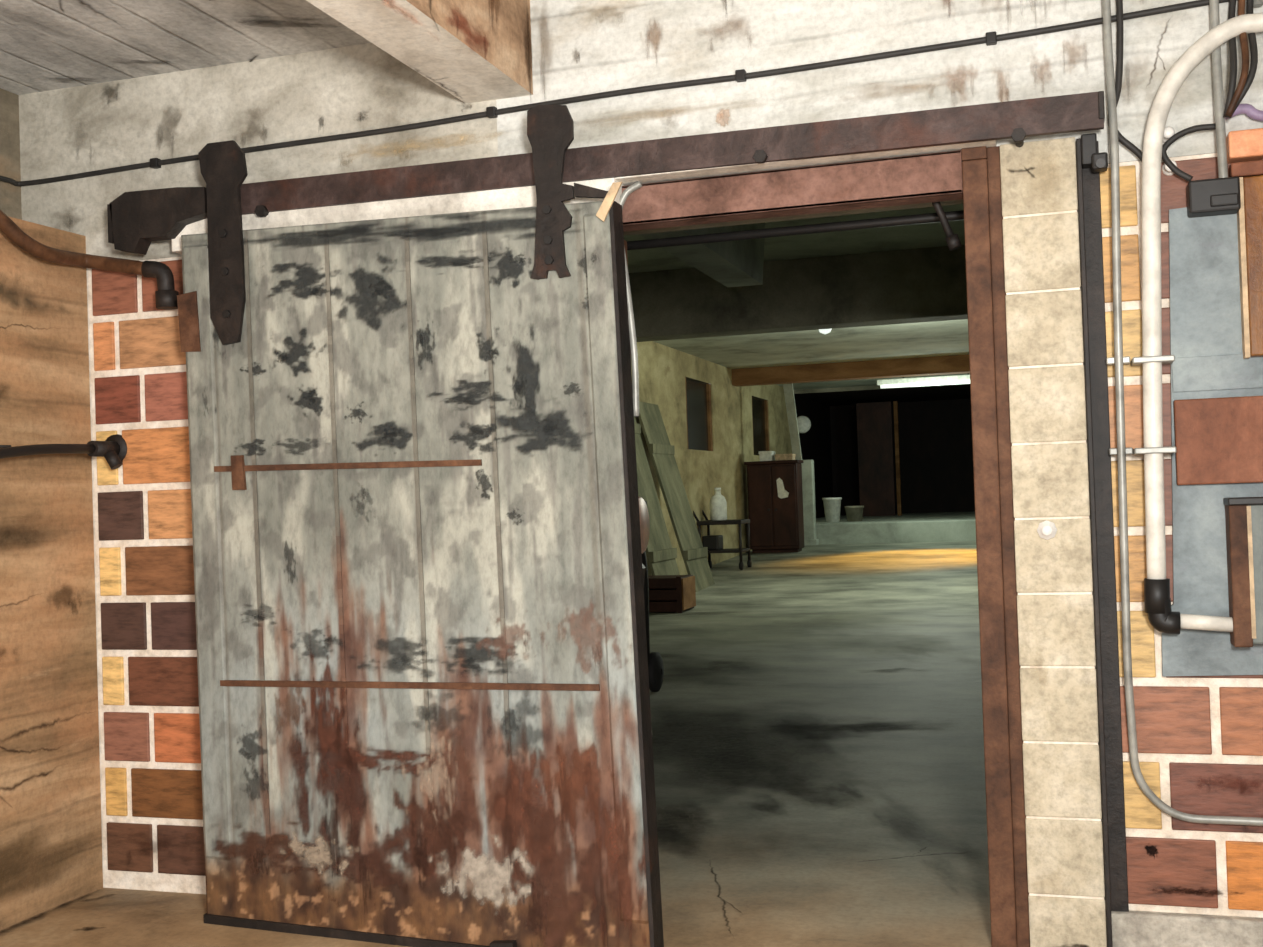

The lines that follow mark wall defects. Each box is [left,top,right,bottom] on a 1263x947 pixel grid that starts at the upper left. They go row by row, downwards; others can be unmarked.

crack [0,720,58,790]